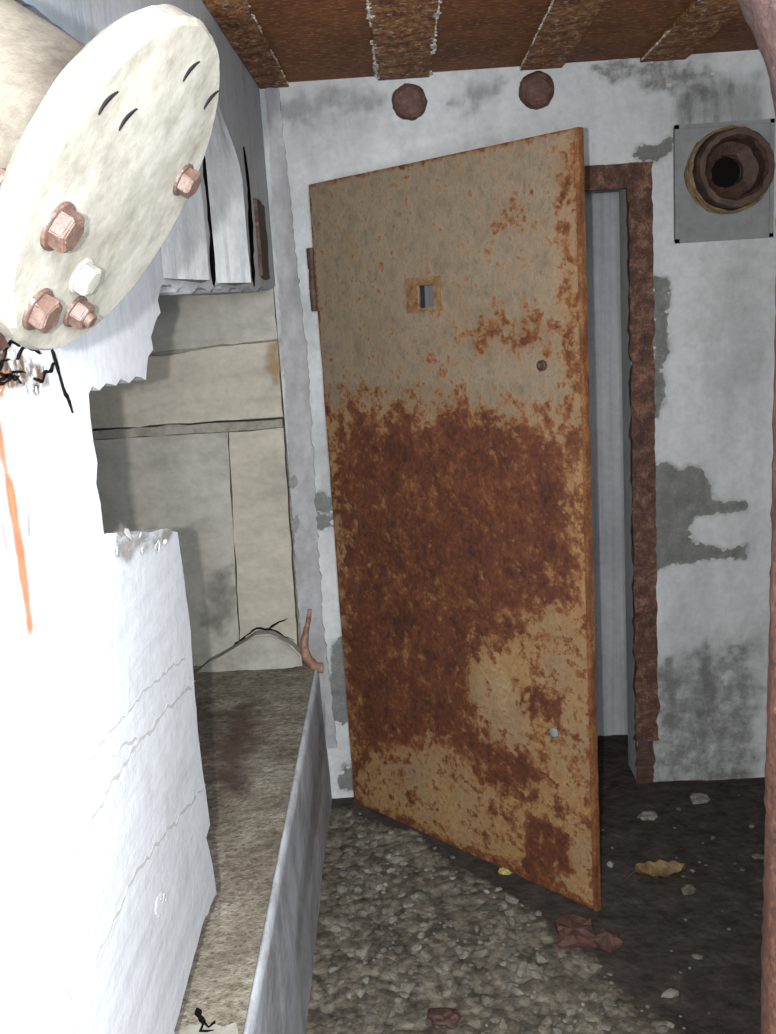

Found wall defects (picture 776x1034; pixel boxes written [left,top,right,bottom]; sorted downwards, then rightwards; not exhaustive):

leakage [370,40,380,79]
leakage [430,0,442,54]
leakage [519,0,554,69]
peeling [0,339,55,394]
crack [51,349,74,413]
rust [0,423,33,633]
spalling [116,528,172,561]
crack [234,618,293,645]
leakage [657,646,755,782]